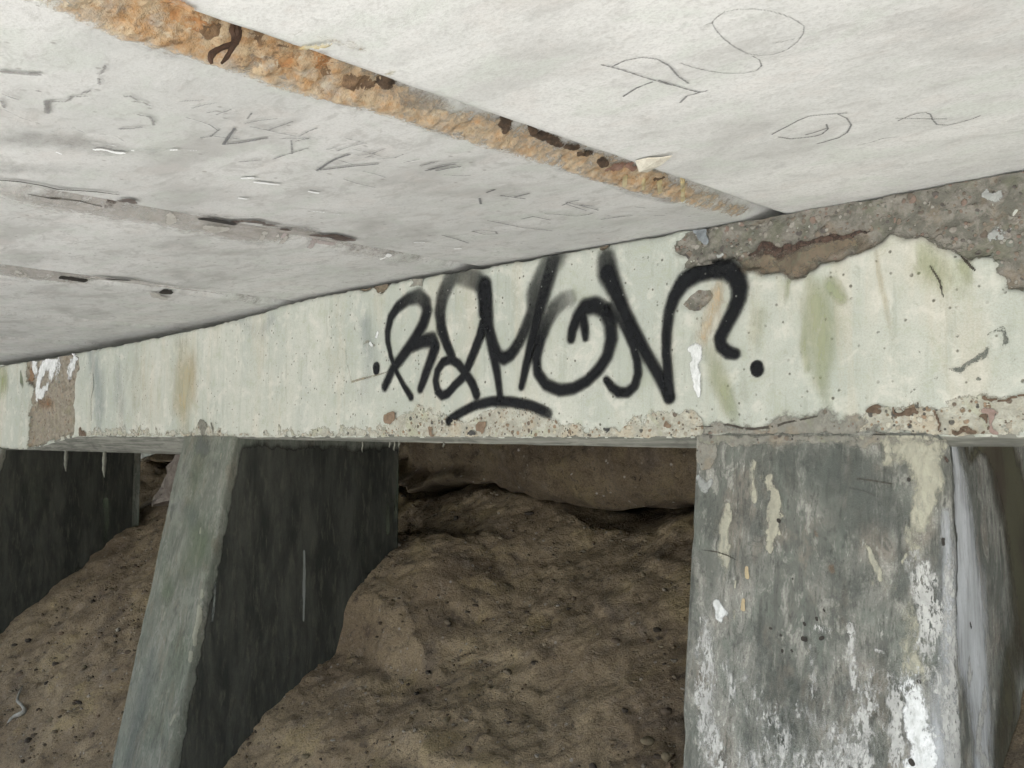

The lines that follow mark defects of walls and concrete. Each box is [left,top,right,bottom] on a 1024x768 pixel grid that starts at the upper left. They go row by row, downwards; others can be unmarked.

rust [42,0,748,216]
spalling [674,171,1024,291]
spalling [26,354,249,448]
spalling [263,404,704,438]
peeling [188,588,204,663]
leakage [692,447,1024,768]